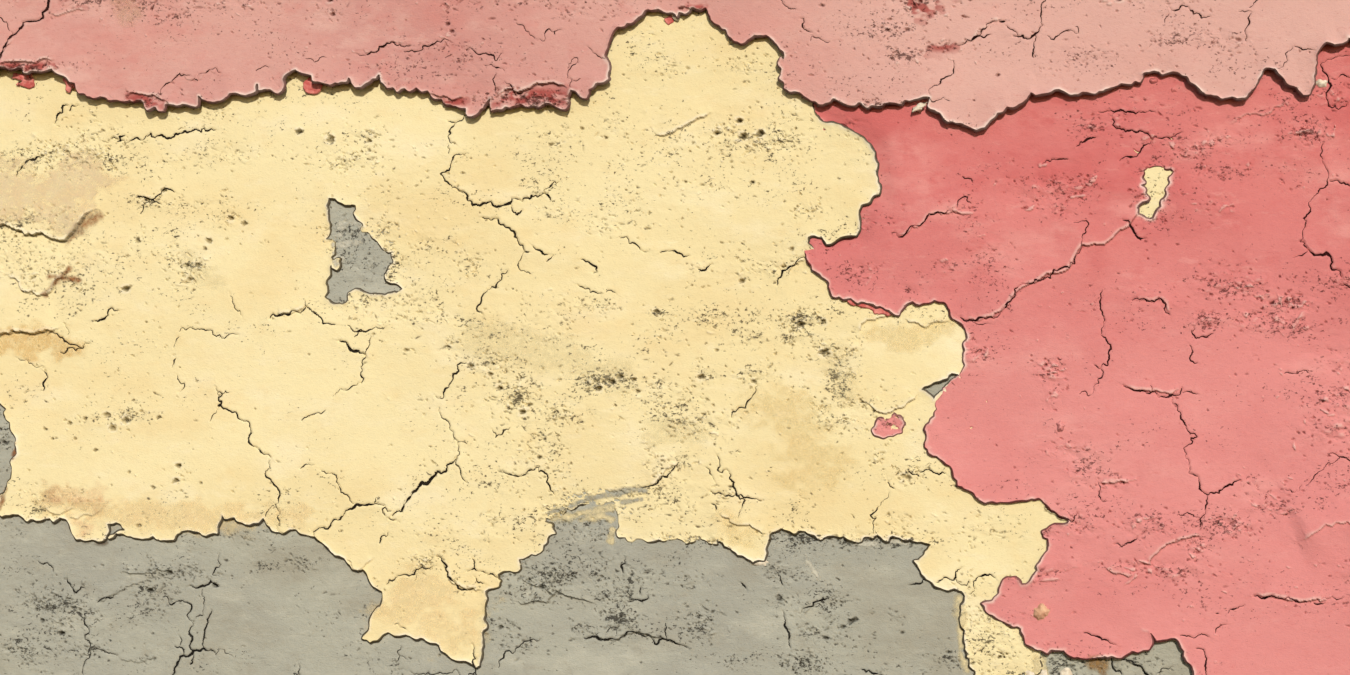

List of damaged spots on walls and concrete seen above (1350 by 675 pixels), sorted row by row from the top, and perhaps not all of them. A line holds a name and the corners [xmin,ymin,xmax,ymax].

peeling [0,48,611,119]
peeling [0,139,108,241]
flaking render [323,200,400,309]
crack [440,115,613,313]
peeling [709,14,1350,419]
crack [172,296,385,421]
crack [211,362,509,544]
spalling [552,361,650,399]
flaking render [0,384,1224,675]
crack [643,457,762,516]
crack [1081,292,1239,527]
crack [164,555,229,675]